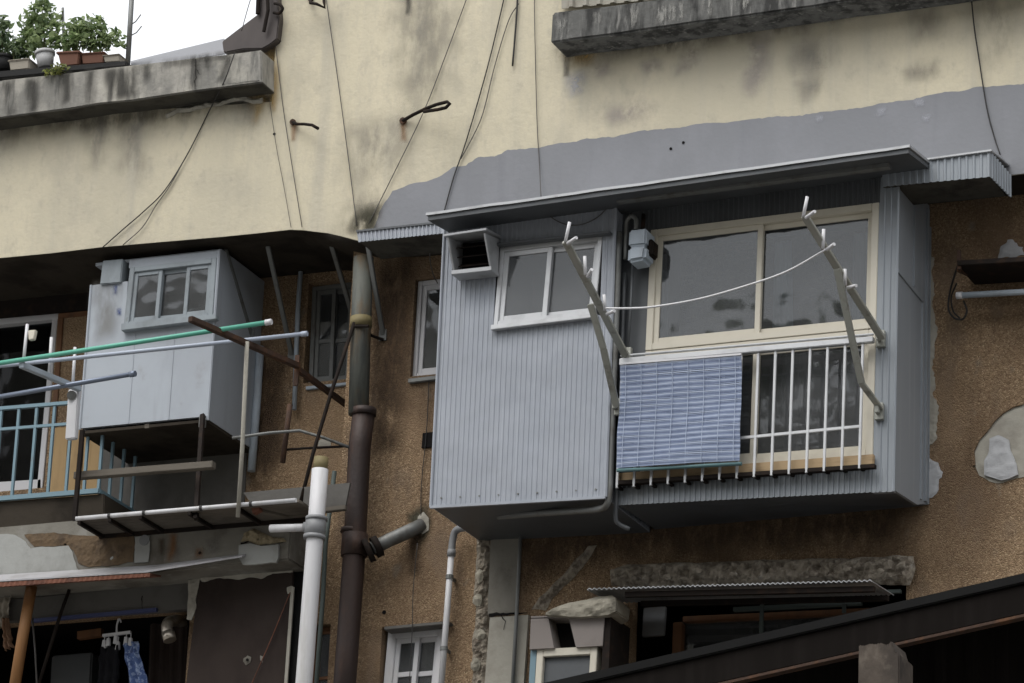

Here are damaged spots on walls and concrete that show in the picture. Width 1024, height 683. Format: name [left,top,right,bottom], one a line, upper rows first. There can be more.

water stain [27,80,36,110]
water stain [106,64,148,97]
water stain [173,54,229,84]
water stain [351,208,378,229]
peeling [930,257,939,444]
spalling [971,401,1024,483]
peeling [929,459,943,498]
peeling [0,532,135,575]